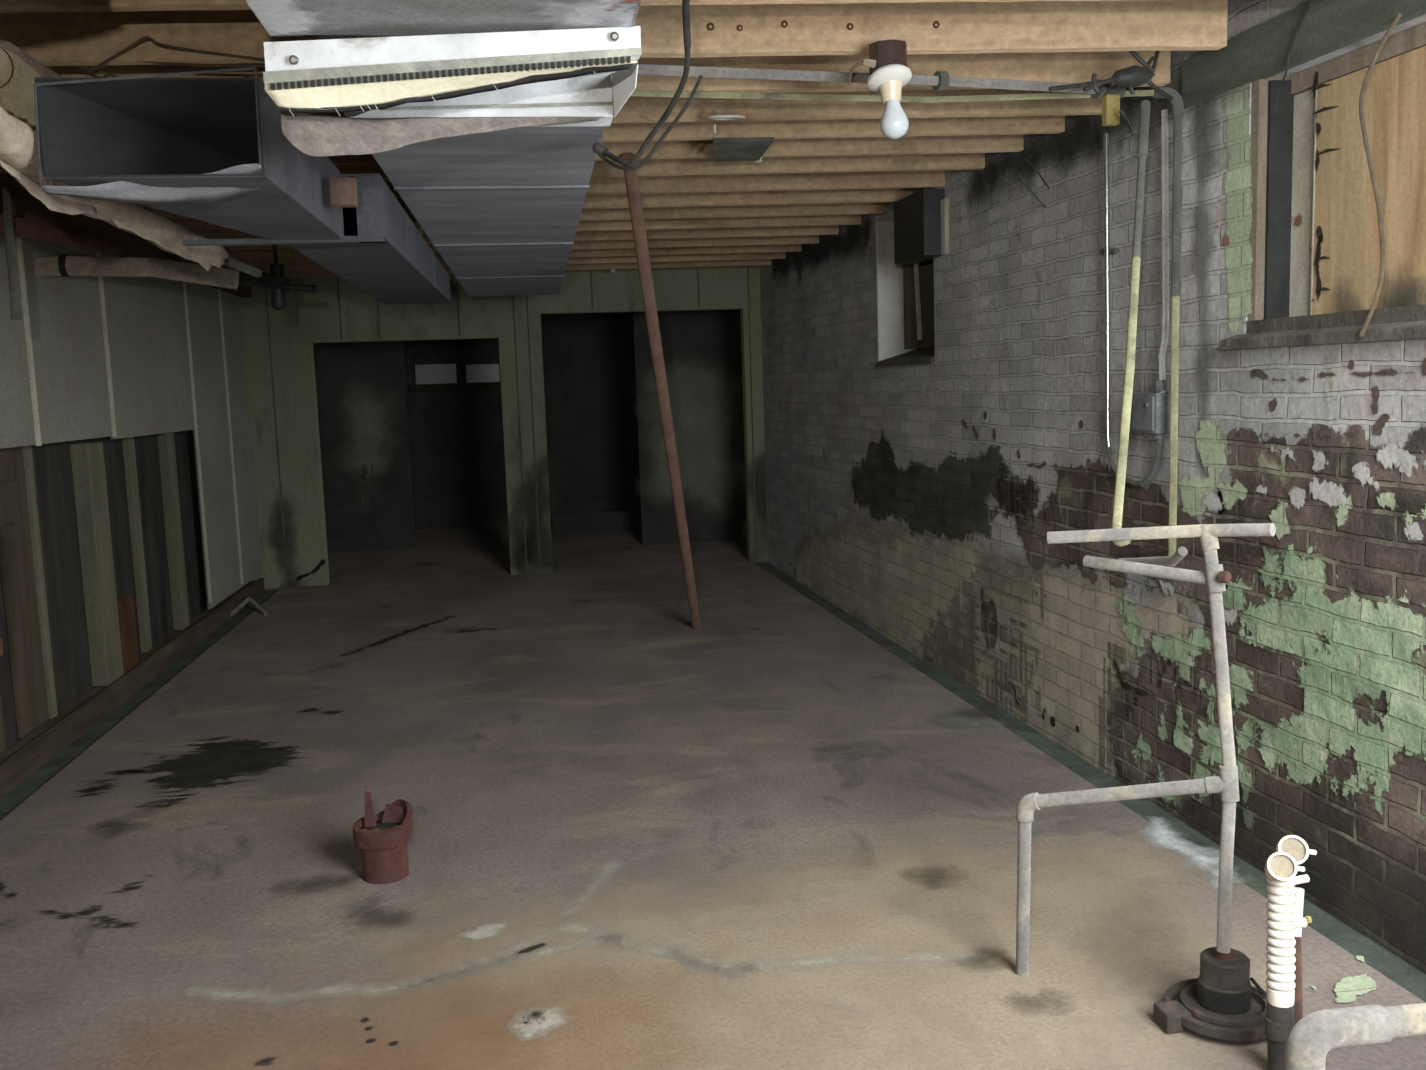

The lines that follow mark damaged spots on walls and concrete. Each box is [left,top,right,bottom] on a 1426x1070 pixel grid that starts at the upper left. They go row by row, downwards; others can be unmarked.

peeling [851,386,1426,959]
water stain [71,736,310,808]
crack [192,925,957,1000]